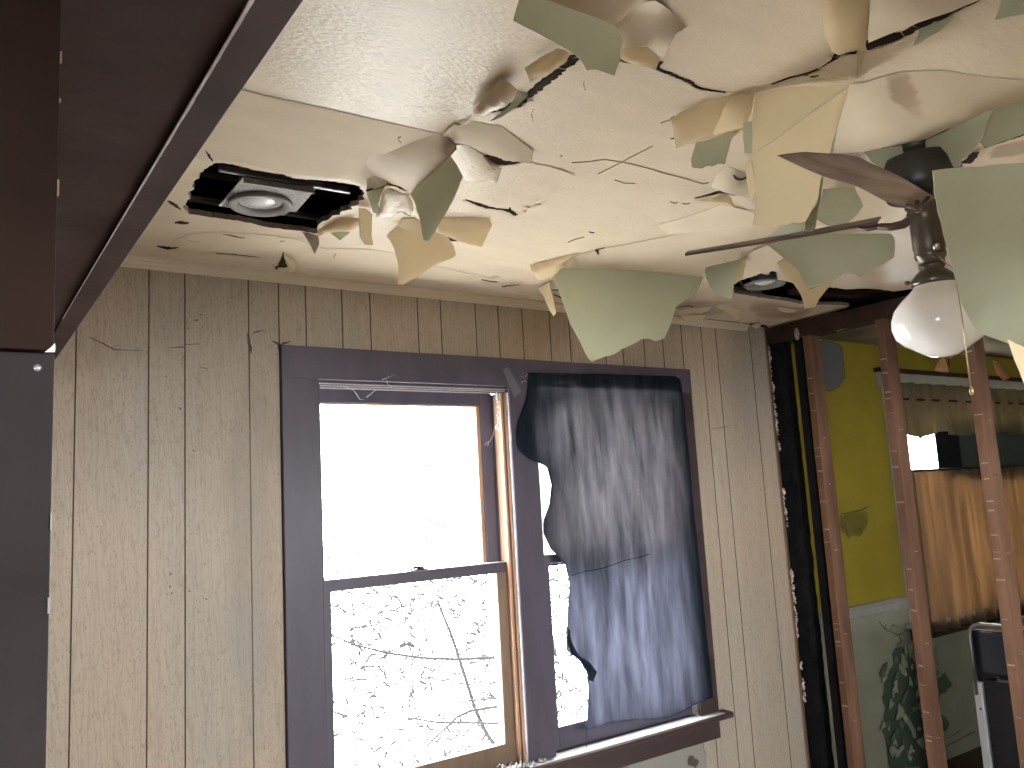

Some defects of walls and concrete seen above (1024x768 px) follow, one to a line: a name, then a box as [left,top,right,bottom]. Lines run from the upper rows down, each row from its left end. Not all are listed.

peeling [302,144,502,285]
peeling [472,79,529,121]
crack [442,55,585,137]
peeling [513,0,662,80]
crack [463,116,746,217]
crack [618,59,726,96]
peeling [671,0,895,308]
crack [771,0,982,87]
peeling [925,101,1024,384]
crack [962,134,1024,164]
peeling [529,253,746,362]
peeling [880,640,928,768]